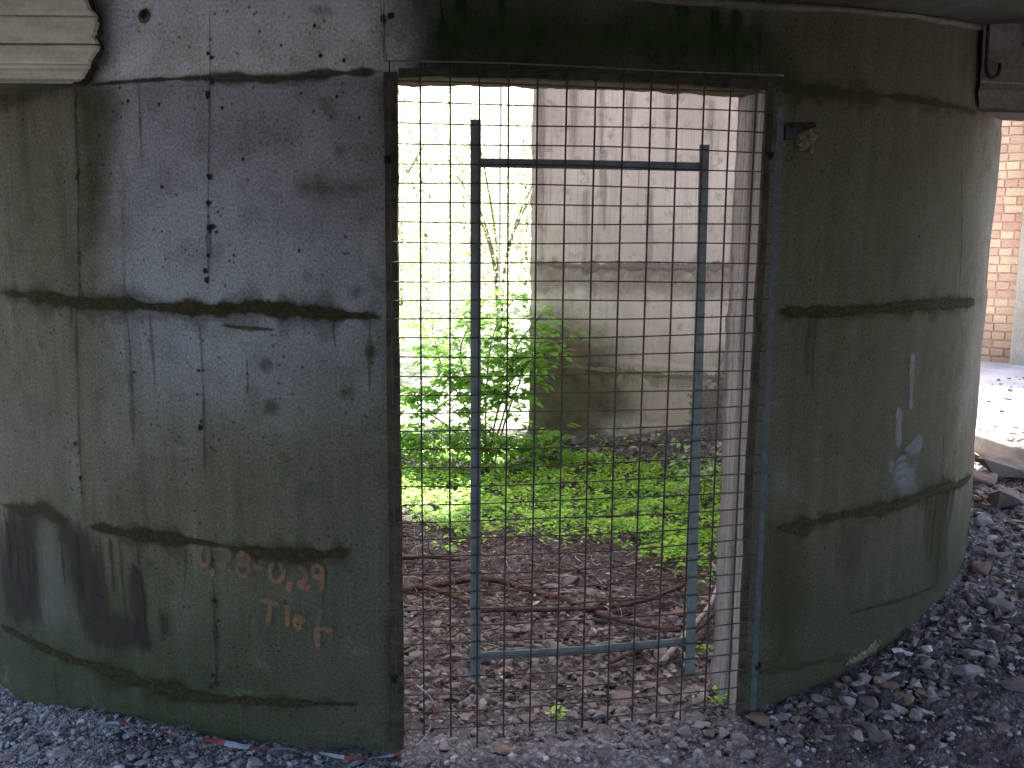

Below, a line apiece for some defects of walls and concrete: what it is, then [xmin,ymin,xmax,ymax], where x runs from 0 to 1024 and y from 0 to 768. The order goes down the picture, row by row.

leakage [1,512,38,623]
leakage [60,521,148,652]